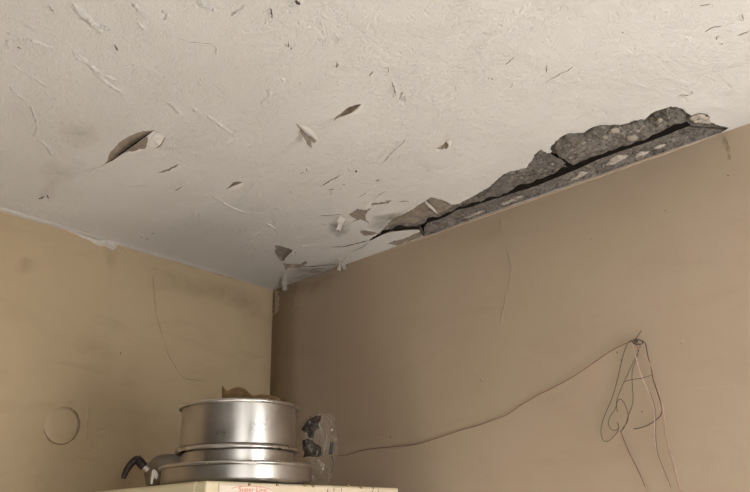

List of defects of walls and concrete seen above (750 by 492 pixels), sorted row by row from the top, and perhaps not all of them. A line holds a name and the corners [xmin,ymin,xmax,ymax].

peeling [335,104,364,120]
peeling [98,130,165,168]
peeling [296,124,318,148]
spalling [336,106,728,260]
peeling [275,245,307,291]